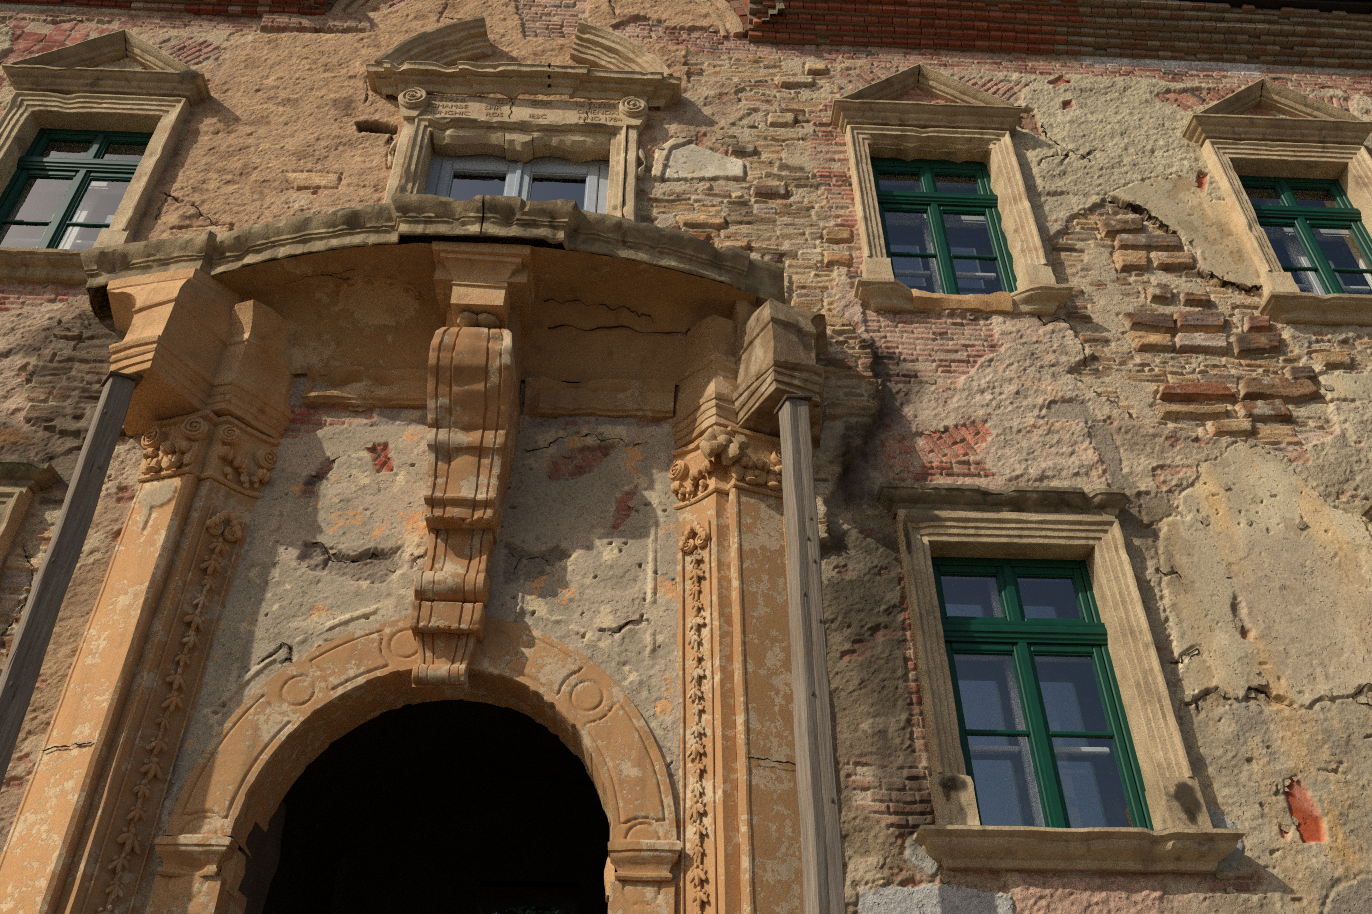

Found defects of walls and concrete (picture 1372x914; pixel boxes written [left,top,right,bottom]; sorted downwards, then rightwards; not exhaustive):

flaking render [0,15,139,90]
crack [1040,124,1106,164]
crack [155,192,219,225]
peeling [1110,170,1262,289]
crack [544,298,691,335]
flaking render [863,304,1005,393]
flaking render [300,540,395,585]
peeling [1163,488,1271,715]
crack [1171,648,1200,671]
crack [1188,686,1294,710]
flaking render [1280,776,1328,843]
flaking render [1159,867,1265,898]